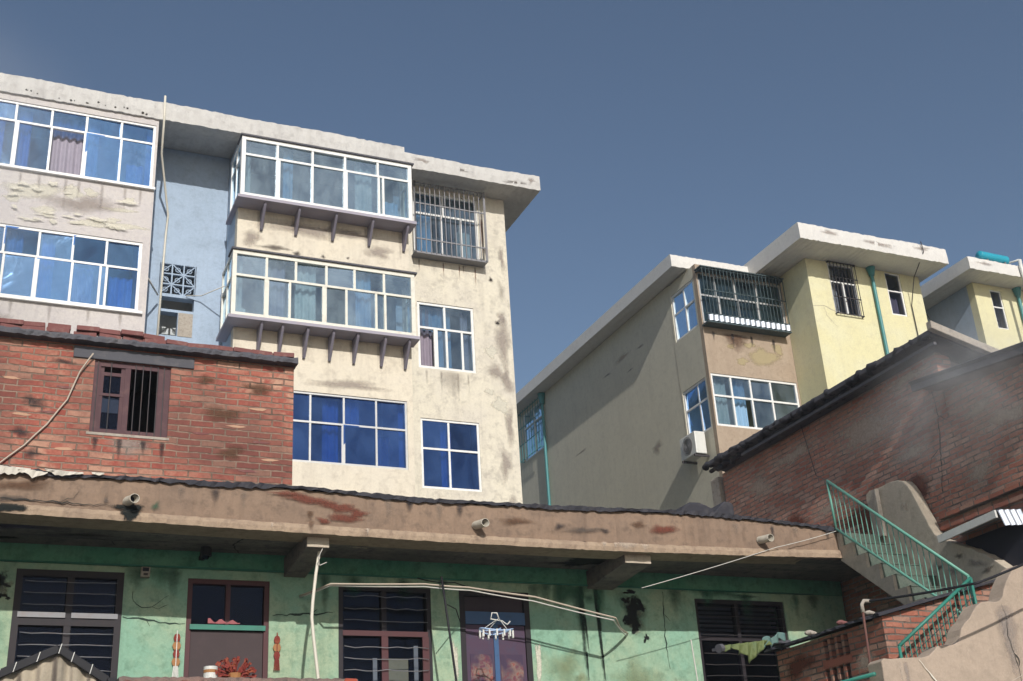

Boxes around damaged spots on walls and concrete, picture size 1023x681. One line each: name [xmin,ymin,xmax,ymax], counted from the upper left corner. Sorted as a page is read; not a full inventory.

peeling [3,181,146,230]
damp [105,499,142,521]
flaking render [273,491,367,523]
peeling [0,571,11,600]
crack [123,593,185,626]
damp [531,585,606,678]
peeling [621,590,649,643]
crack [1001,604,1022,681]